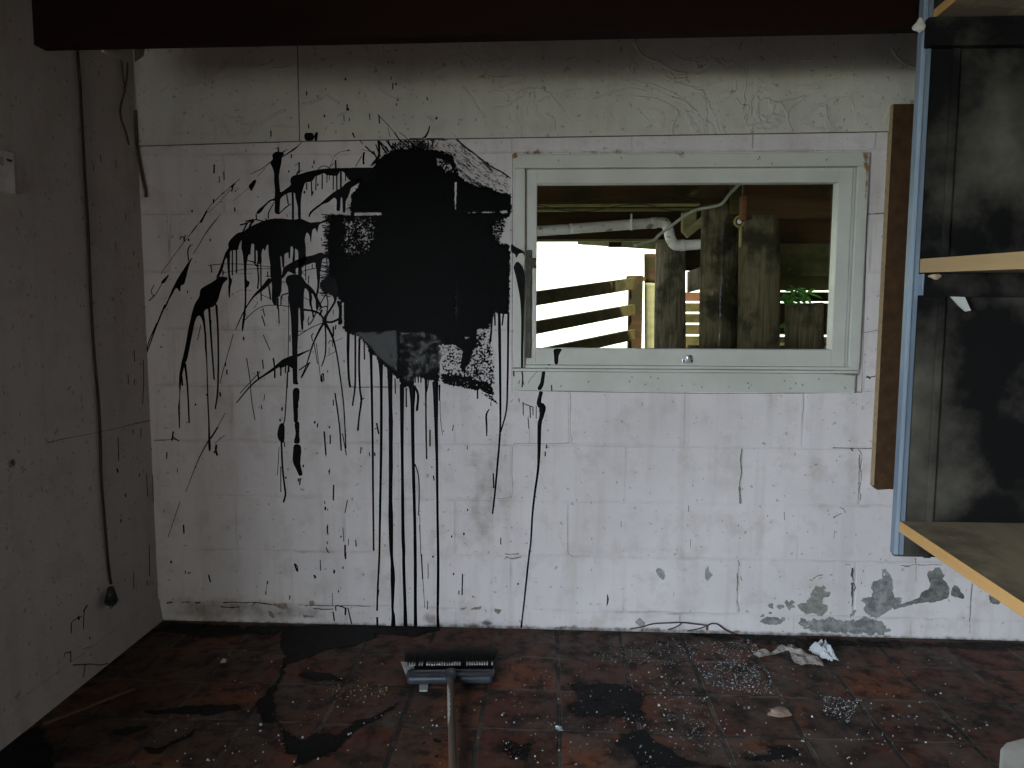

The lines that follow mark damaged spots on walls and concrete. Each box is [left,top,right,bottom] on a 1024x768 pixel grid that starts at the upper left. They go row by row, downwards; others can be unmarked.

crack [736,449,744,504]
crack [811,564,856,606]
peeling [760,567,964,636]